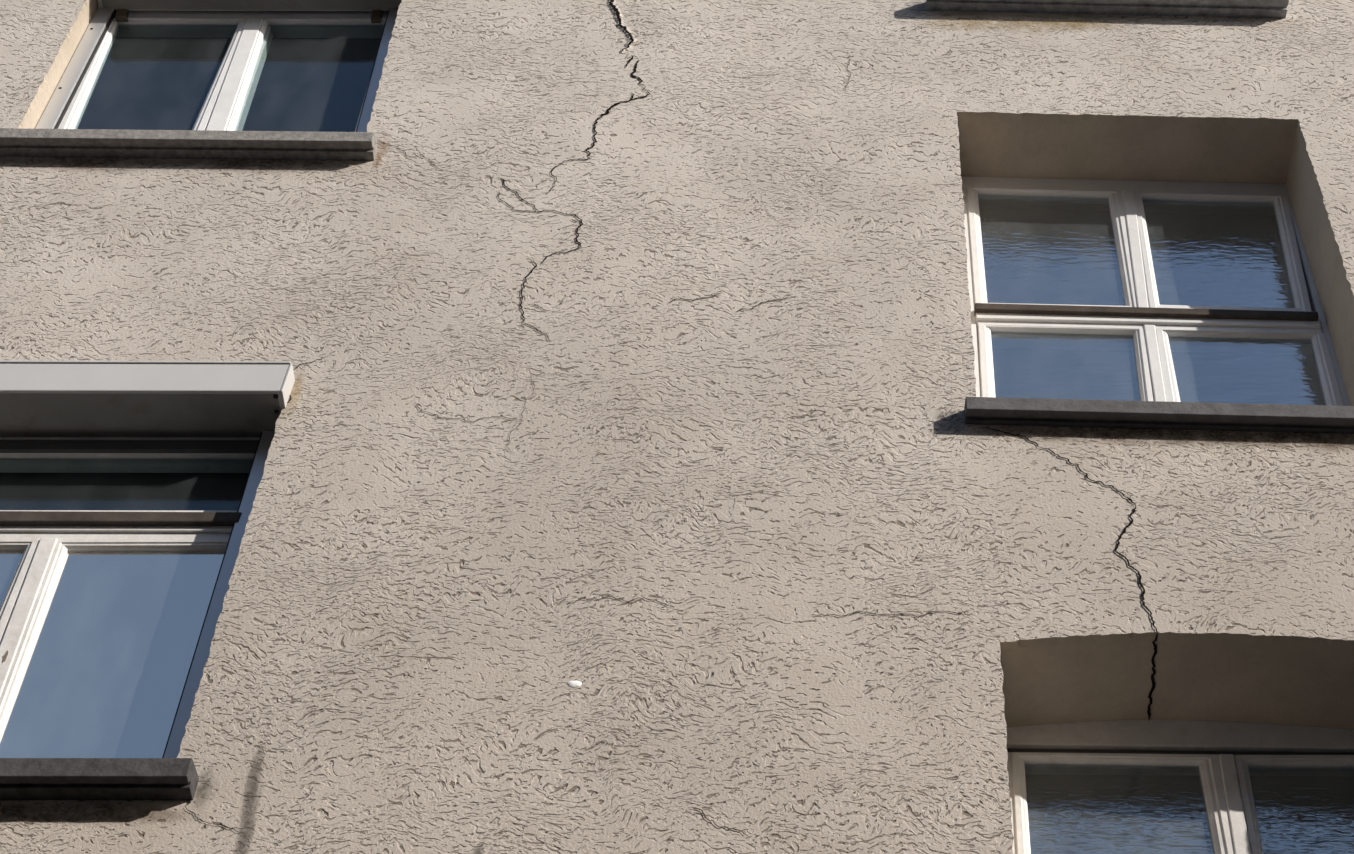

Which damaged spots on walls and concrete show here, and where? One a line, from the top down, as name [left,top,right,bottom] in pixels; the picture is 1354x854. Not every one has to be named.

crack [498,0,650,341]
crack [506,373,581,453]
crack [988,427,1158,721]